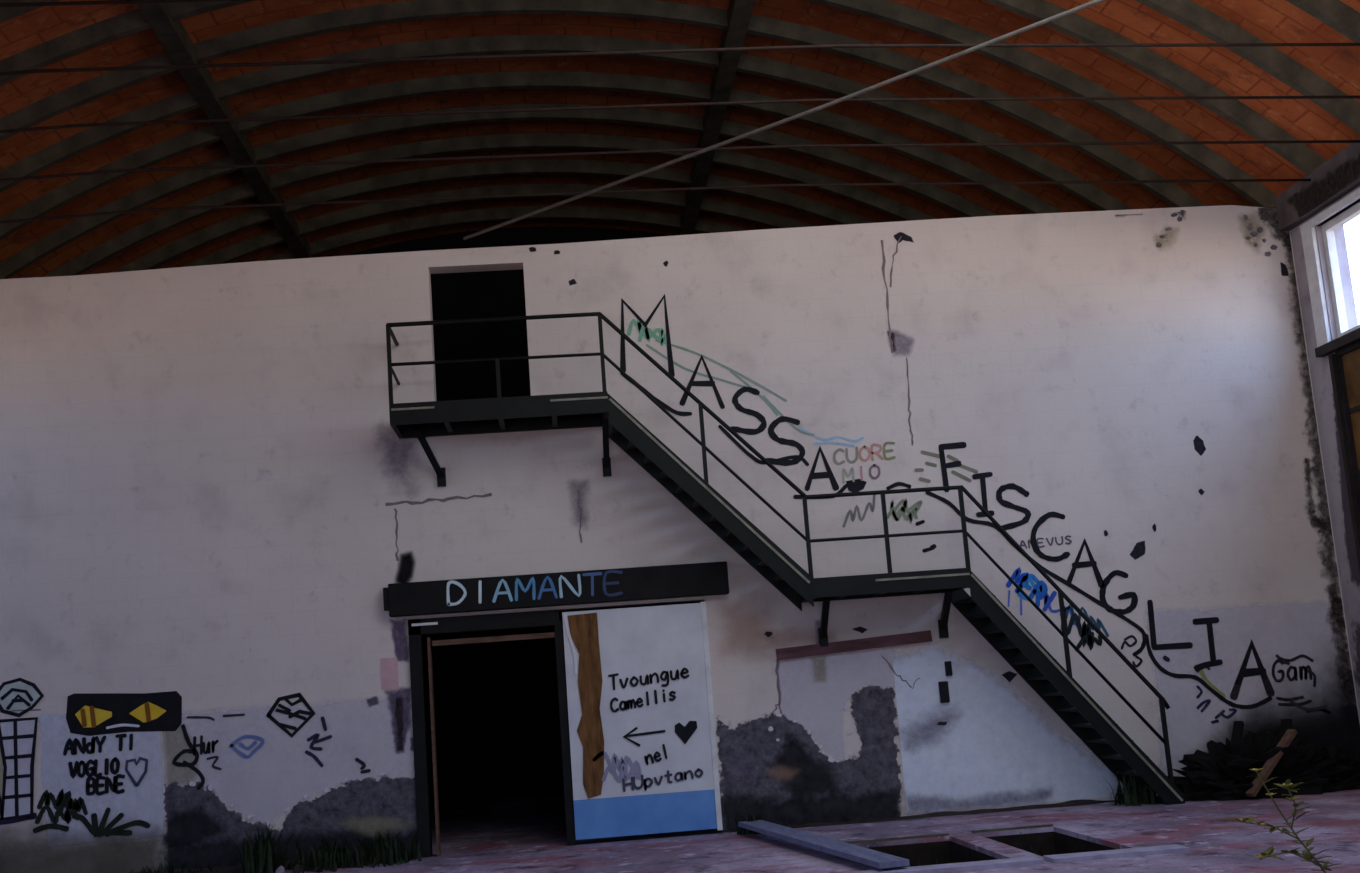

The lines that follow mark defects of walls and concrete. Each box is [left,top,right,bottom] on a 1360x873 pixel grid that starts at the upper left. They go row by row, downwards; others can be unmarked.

damp [1281,246,1360,685]
peeling [160,773,418,871]
peeling [716,686,902,833]
spalling [845,824,1190,873]